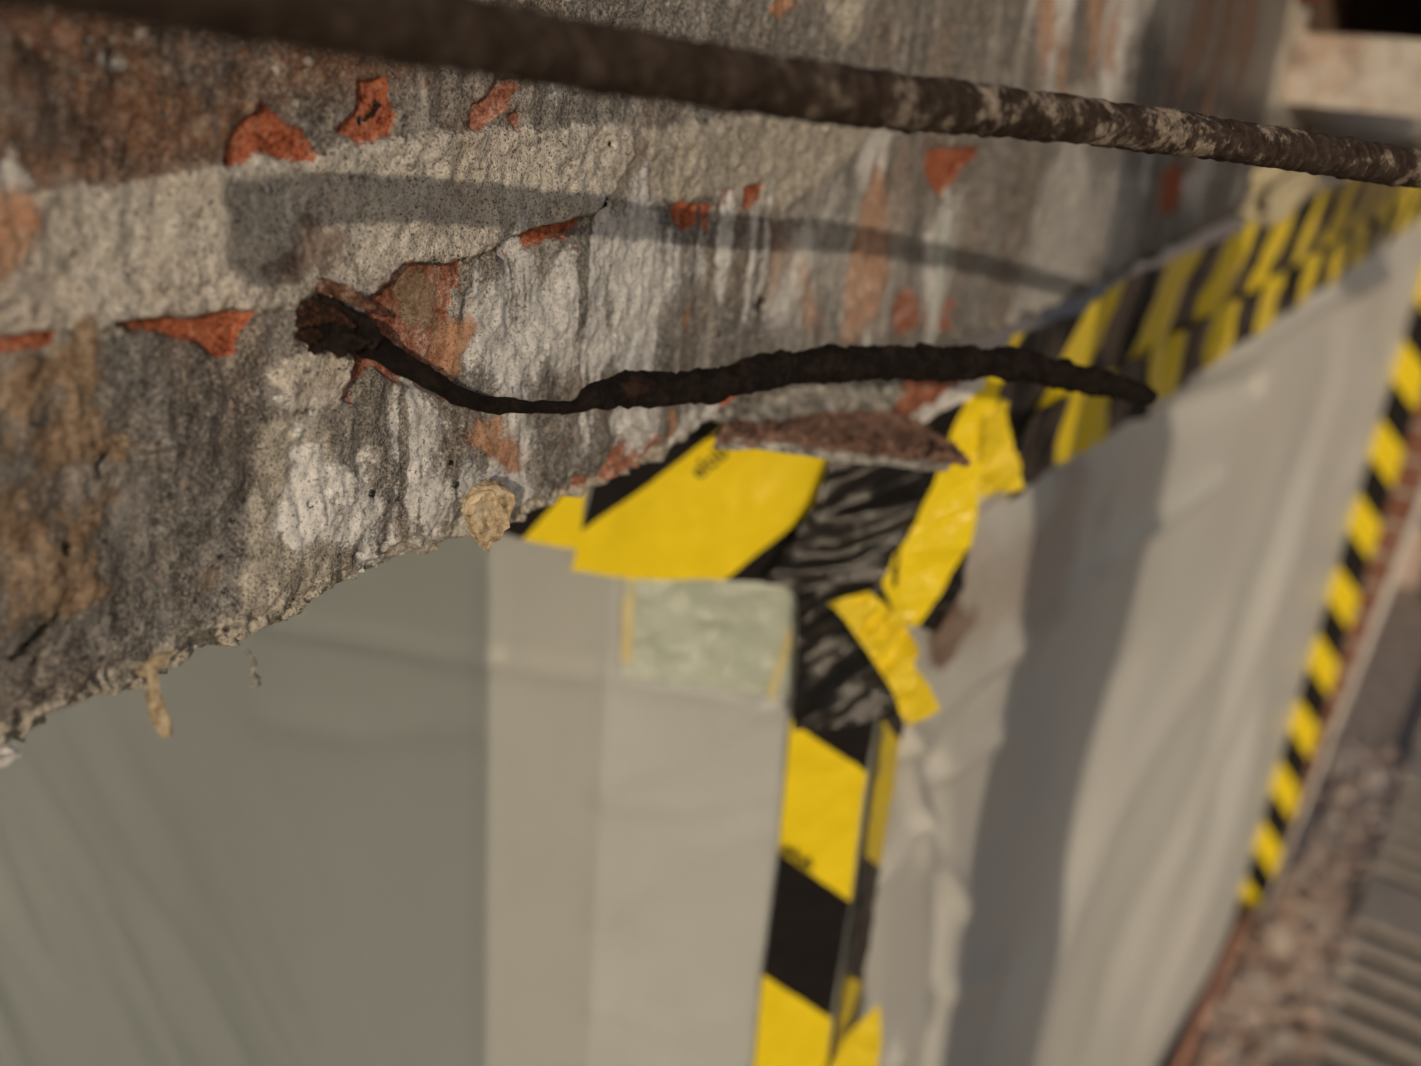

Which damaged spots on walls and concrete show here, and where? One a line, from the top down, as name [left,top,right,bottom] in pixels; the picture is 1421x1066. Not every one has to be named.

rust [1036,0,1121,93]
spalling [0,0,1421,216]
rust [263,212,349,298]
spalling [493,216,579,258]
spalling [670,182,763,232]
rust [841,156,893,347]
spalling [116,309,256,358]
rust [380,267,476,381]
water stain [256,128,968,580]
spalling [293,260,1158,415]
rust [468,415,522,473]
spalling [461,478,515,552]